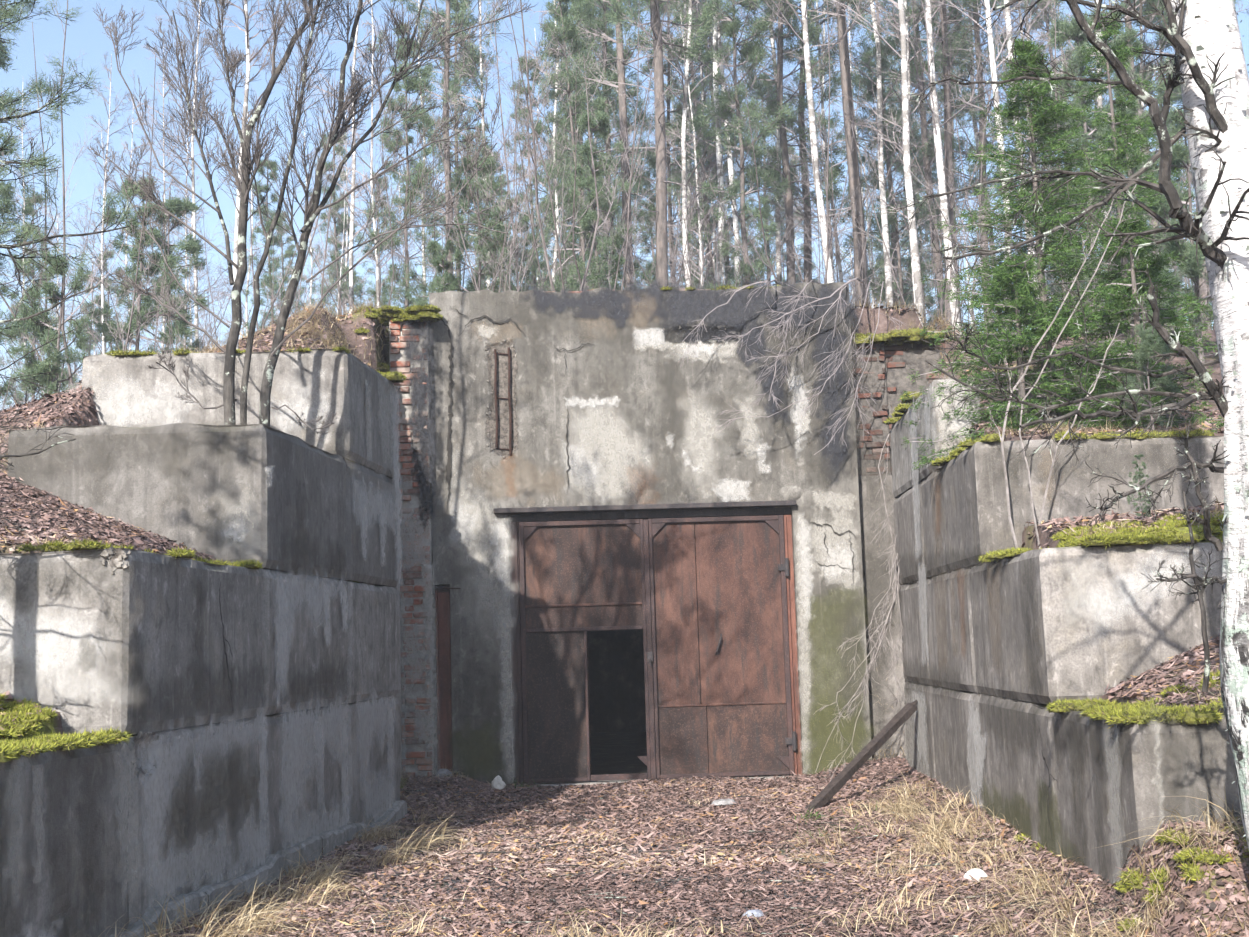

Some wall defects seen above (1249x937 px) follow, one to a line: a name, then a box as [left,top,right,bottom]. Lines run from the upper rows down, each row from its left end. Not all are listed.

crack [439,309,527,512]
spalling [479,329,522,459]
crack [555,343,596,490]
leakage [529,278,856,485]
crack [808,522,856,583]
leakage [119,696,393,894]
leakage [969,706,1031,836]